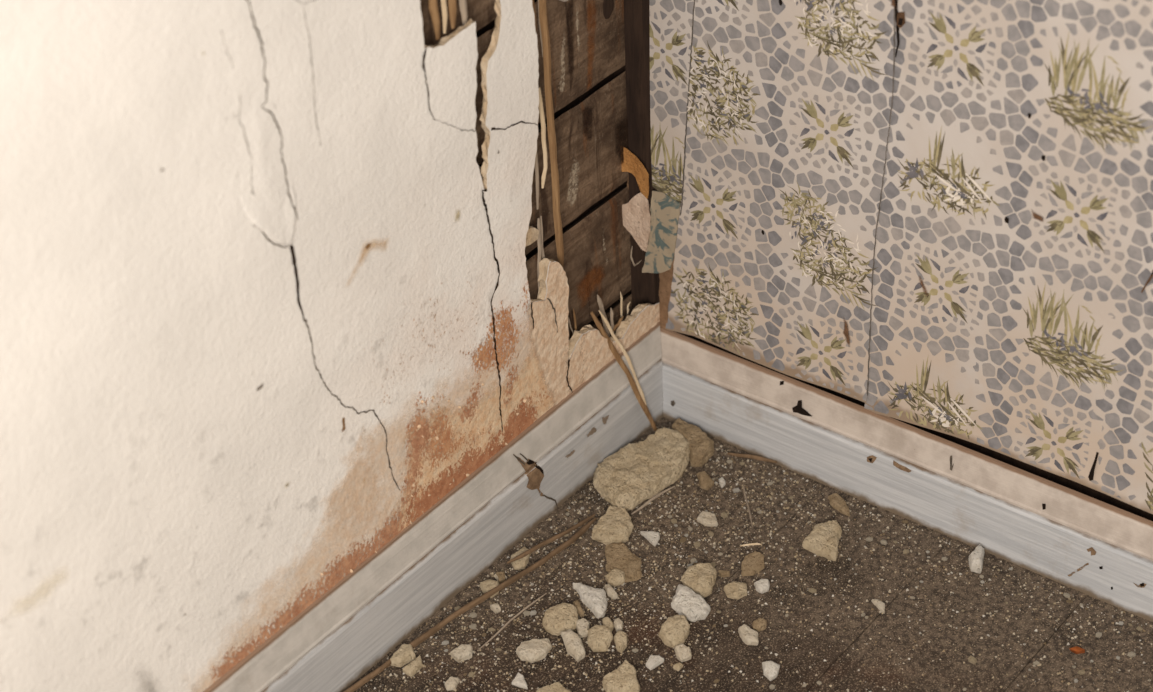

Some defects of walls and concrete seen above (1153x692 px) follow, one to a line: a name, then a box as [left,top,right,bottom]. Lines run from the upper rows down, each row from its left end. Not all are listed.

crack [239,0,401,491]
water stain [195,331,556,692]
flaking render [210,258,660,682]
crack [422,48,538,132]
spalling [475,0,501,190]
crack [482,189,503,432]